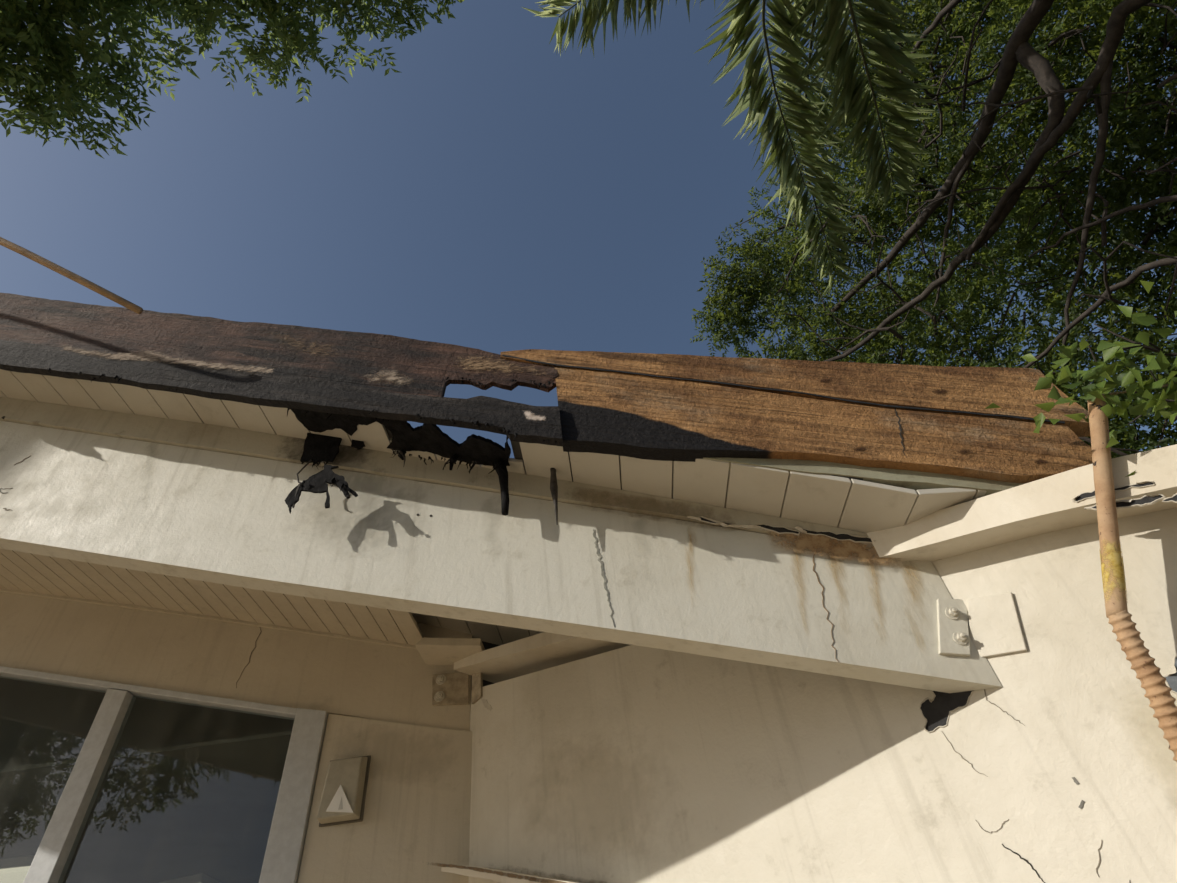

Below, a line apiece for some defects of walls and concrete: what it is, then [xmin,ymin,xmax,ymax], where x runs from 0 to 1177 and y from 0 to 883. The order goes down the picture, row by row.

spalling [1071,490,1097,510]
spalling [1114,481,1177,509]
crack [593,529,614,625]
rust [770,531,916,584]
crack [813,553,839,662]
peeling [1163,656,1177,694]
spalling [919,690,975,733]
crack [976,819,1045,883]